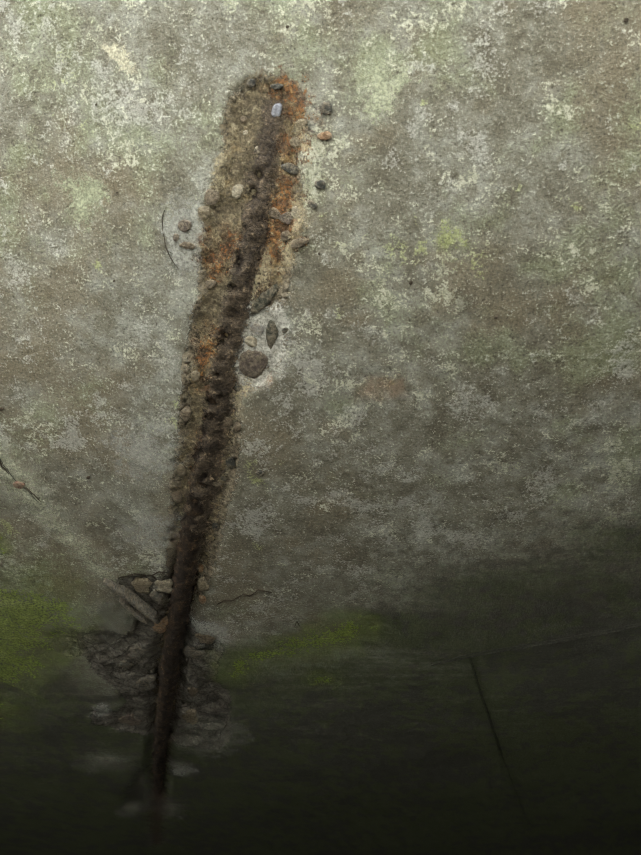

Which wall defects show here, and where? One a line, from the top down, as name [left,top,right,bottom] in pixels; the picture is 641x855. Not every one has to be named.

crack [0,459,41,502]
spalling [48,132,244,737]
crack [217,589,272,605]
rust [170,64,323,580]
spalling [169,116,332,750]
spalling [319,101,332,115]